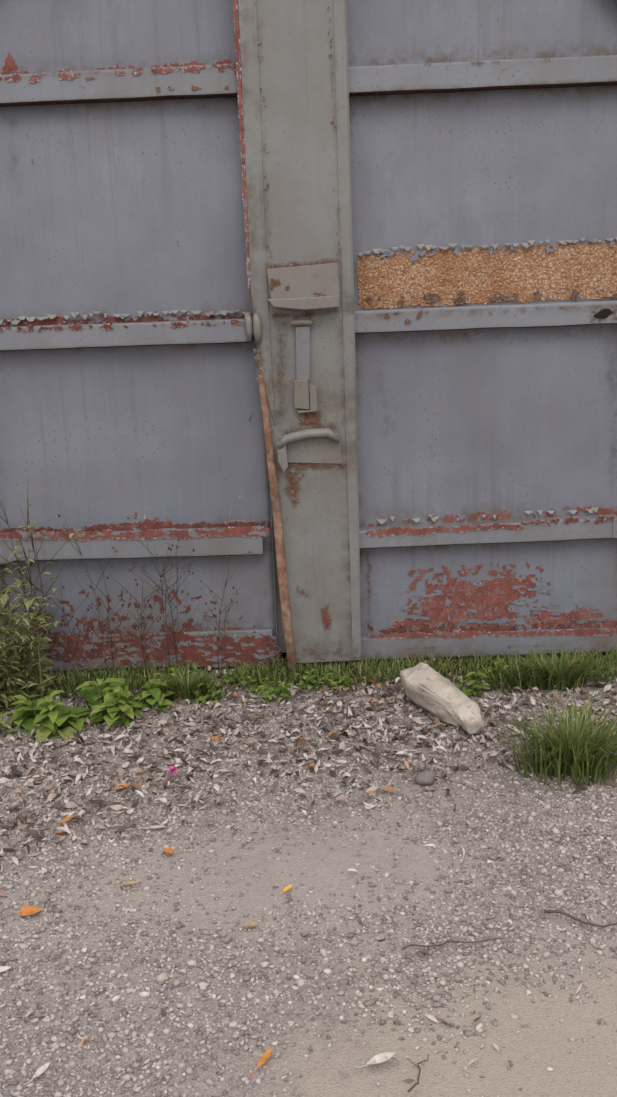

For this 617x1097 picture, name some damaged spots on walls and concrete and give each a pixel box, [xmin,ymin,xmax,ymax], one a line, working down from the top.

peeling [0,0,251,296]
peeling [0,310,253,333]